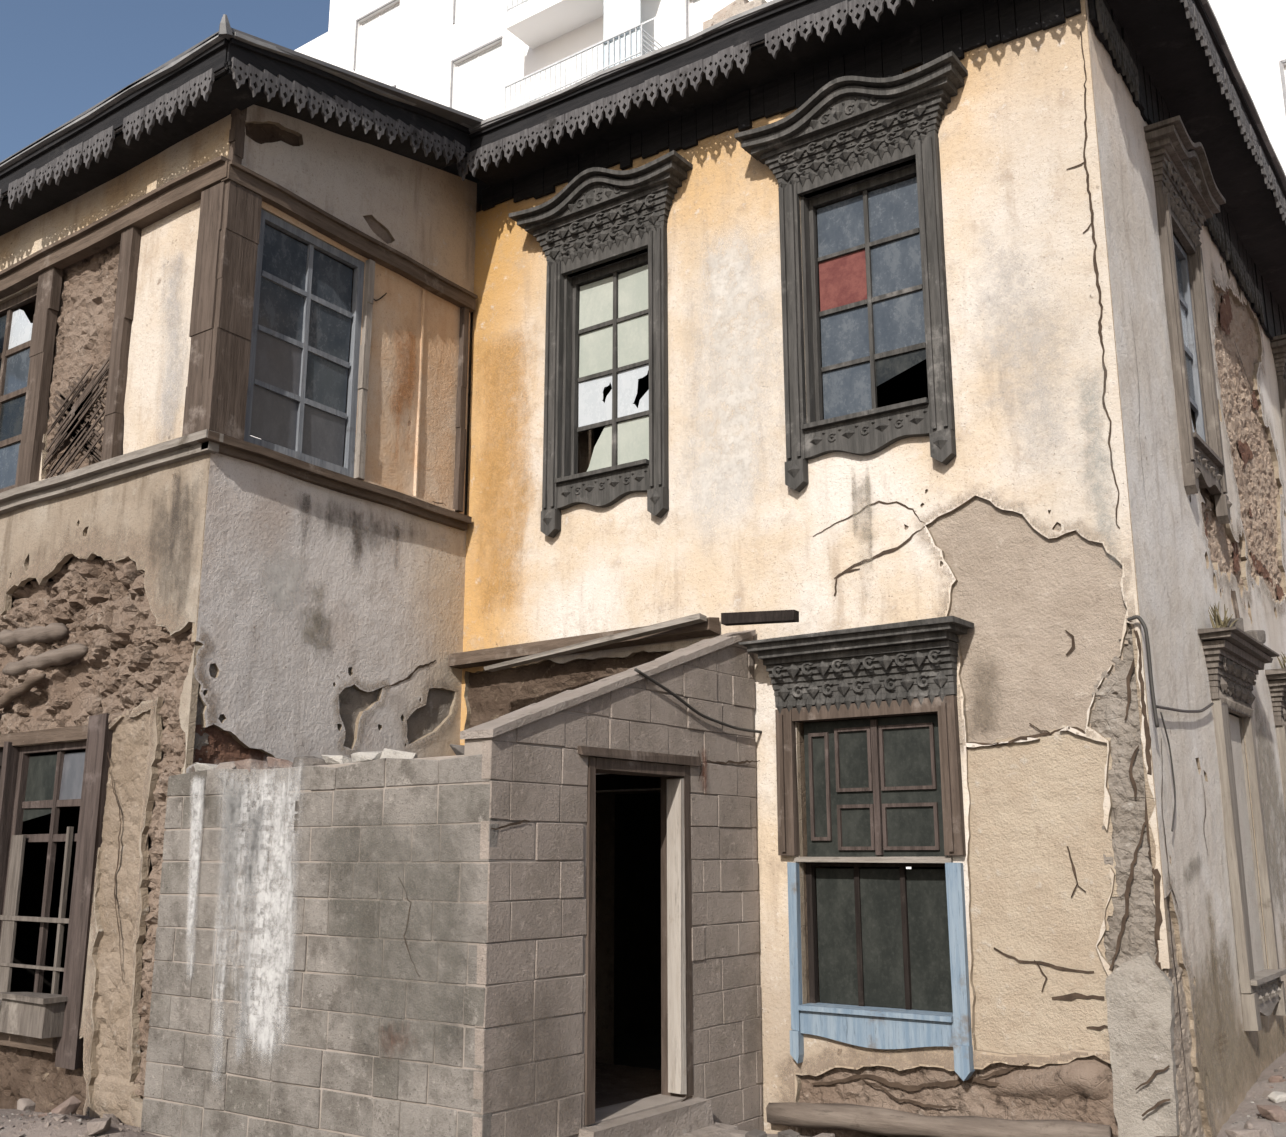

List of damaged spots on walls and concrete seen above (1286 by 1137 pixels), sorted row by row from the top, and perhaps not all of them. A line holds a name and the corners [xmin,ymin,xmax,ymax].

peeling [0,627,223,1126]
peeling [336,667,388,752]
crack [383,660,436,688]
peeling [400,681,457,746]
crack [813,501,925,596]
peeling [783,490,1216,1137]
crack [960,723,1086,746]
crack [994,621,1191,1118]
crack [1066,31,1147,529]
peeling [1201,272,1285,613]